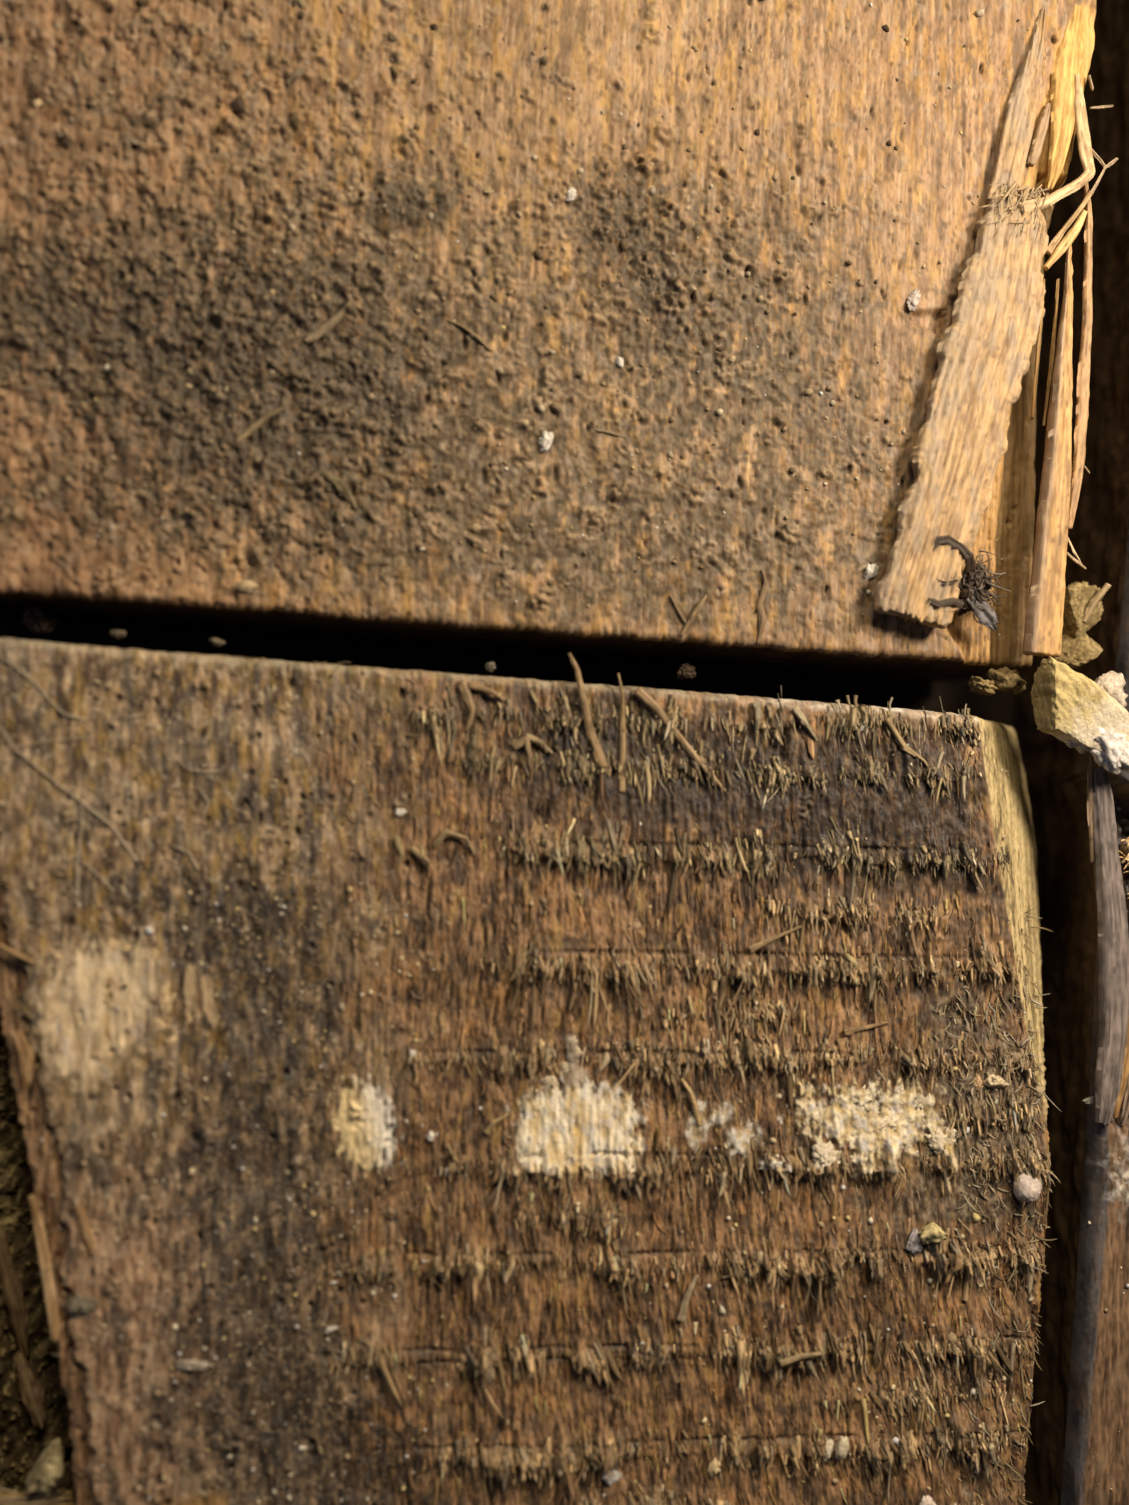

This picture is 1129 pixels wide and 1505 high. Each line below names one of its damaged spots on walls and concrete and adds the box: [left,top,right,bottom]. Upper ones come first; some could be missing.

water stain [350,162,452,224]
water stain [557,146,707,389]
water stain [0,204,461,582]
water stain [24,855,462,1505]
water stain [504,1035,647,1179]
water stain [686,1099,762,1155]
water stain [758,1160,792,1173]
water stain [777,1067,963,1179]